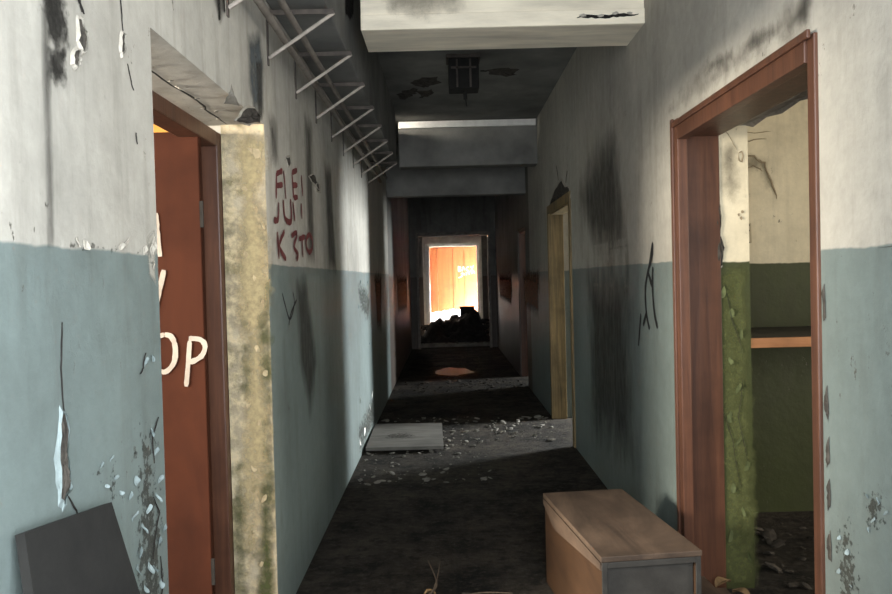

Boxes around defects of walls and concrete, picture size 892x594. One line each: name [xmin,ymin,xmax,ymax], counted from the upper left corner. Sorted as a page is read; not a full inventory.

crack [70,0,89,71]
crack [119,0,134,91]
crack [726,131,771,162]
peeling [864,491,888,533]
peeling [827,523,859,594]